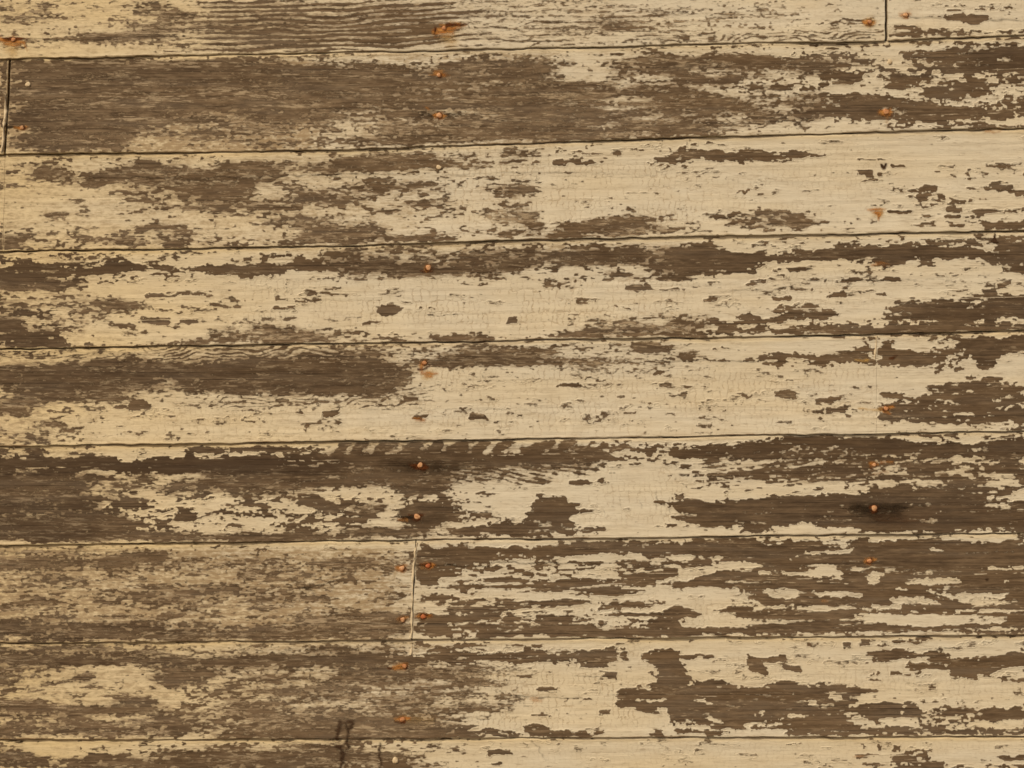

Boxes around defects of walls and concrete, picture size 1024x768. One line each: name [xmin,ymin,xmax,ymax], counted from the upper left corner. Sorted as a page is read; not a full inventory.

peeling [0,0,73,26]
rust [432,23,468,34]
peeling [499,146,544,176]
peeling [855,157,907,184]
peeling [935,161,1024,181]
peeling [965,180,1024,200]
peeling [44,212,69,235]
peeling [700,206,830,232]
peeling [538,273,595,291]
peeling [325,287,413,326]
peeling [437,404,524,437]
peeling [368,578,410,606]